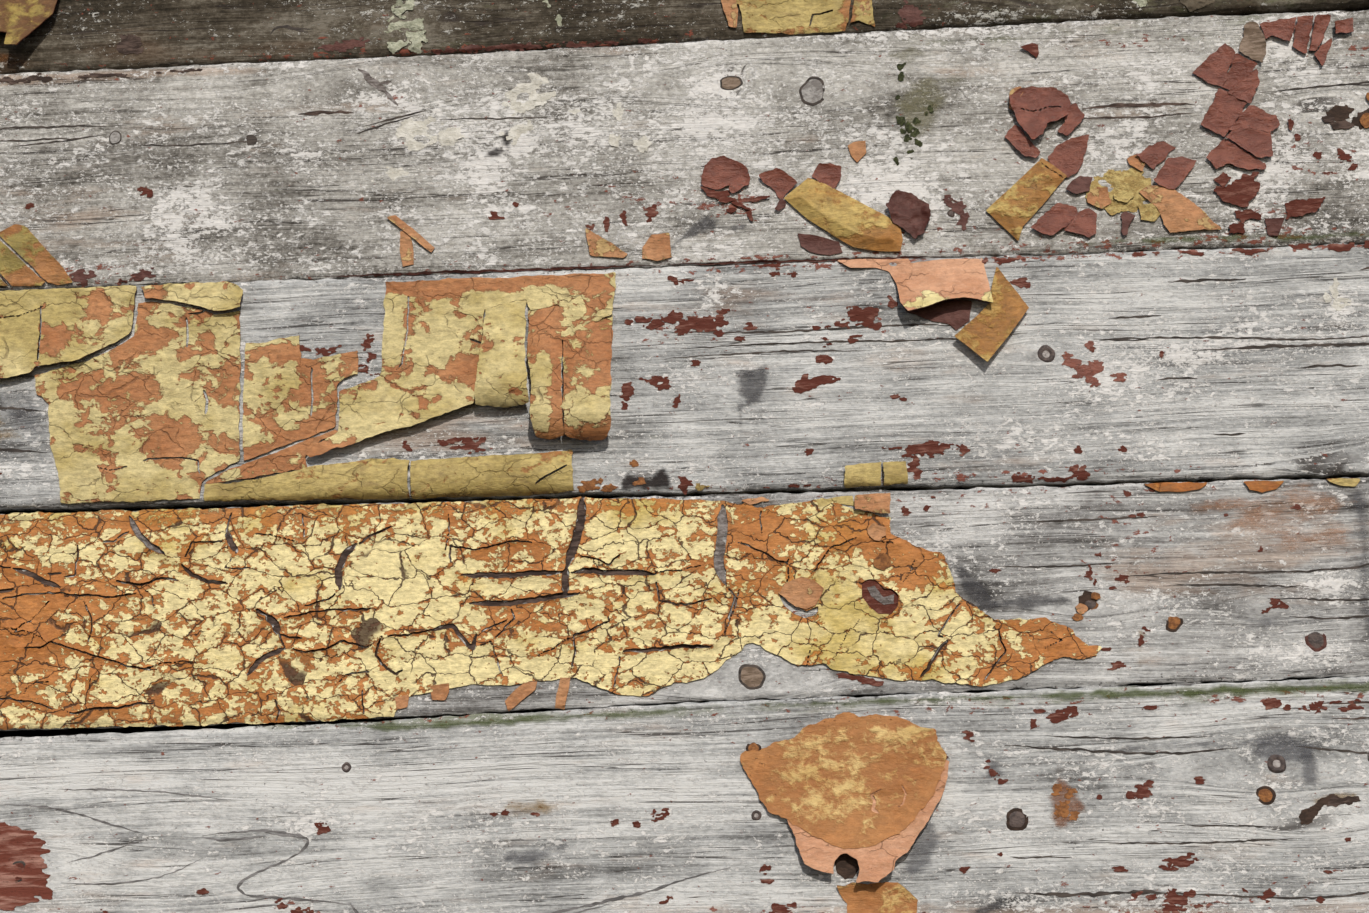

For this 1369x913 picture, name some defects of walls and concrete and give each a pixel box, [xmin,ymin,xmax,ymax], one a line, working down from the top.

peeling [721,0,875,34]
peeling [895,0,927,29]
peeling [137,186,153,198]
peeling [701,141,1031,394]
peeling [986,14,1369,256]
crack [0,405,47,413]
crack [0,446,47,454]
peeling [0,202,1130,730]
crack [0,513,304,714]
peeling [740,712,949,913]